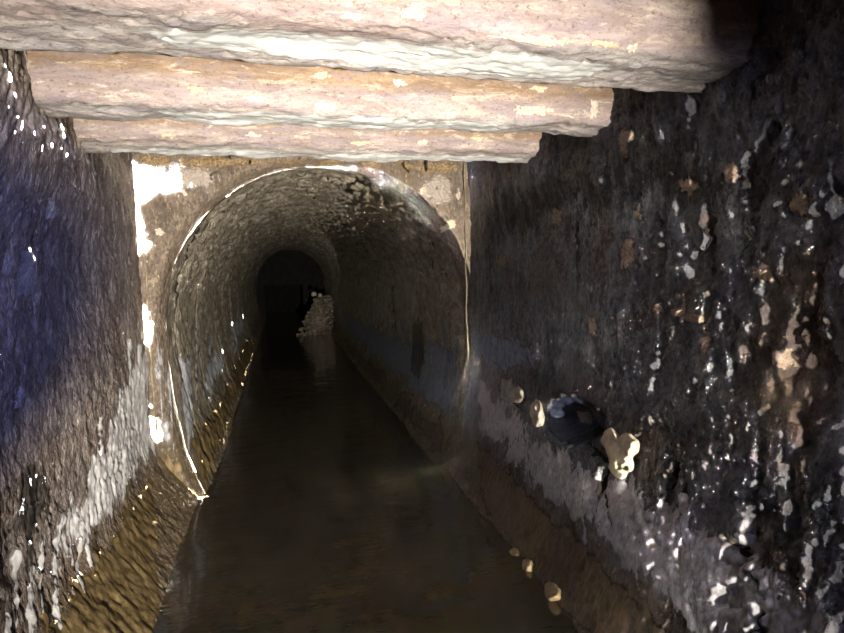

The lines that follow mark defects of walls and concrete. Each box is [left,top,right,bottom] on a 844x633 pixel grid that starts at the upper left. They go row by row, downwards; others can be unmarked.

damp [4,306,255,633]